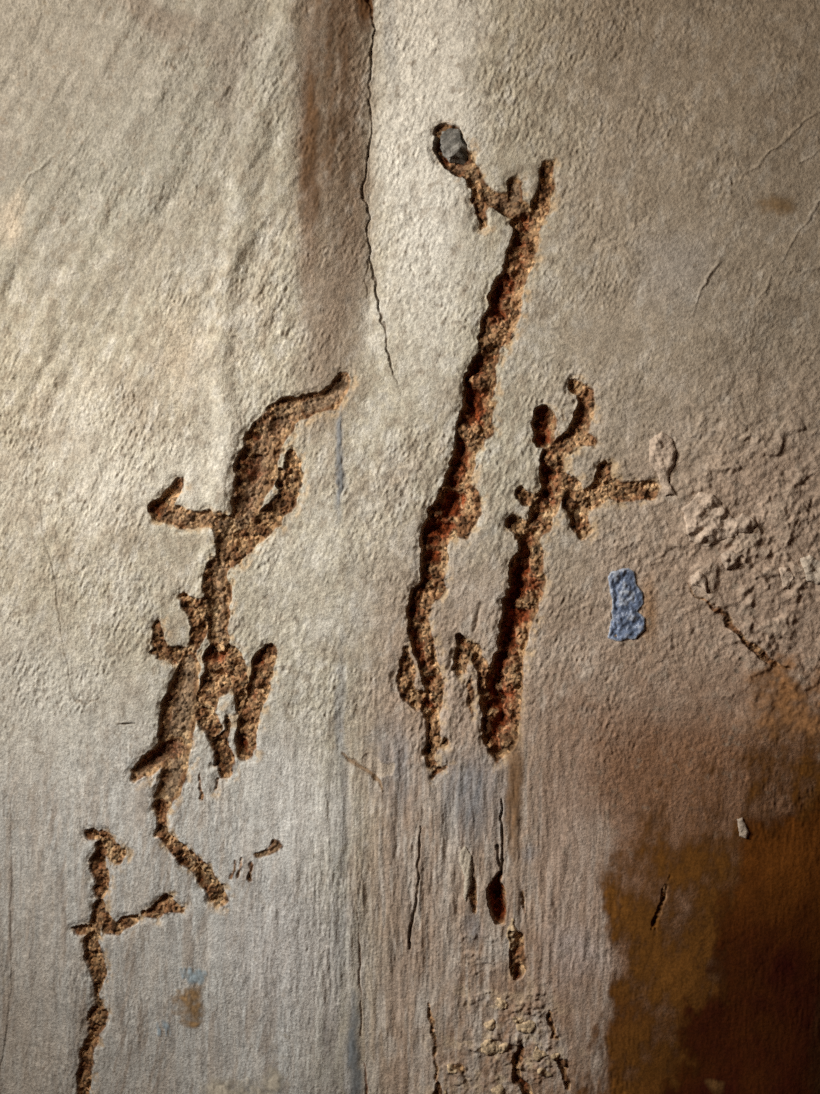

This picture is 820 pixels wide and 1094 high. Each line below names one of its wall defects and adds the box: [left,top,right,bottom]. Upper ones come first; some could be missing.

crack [359,0,401,395]
spalling [196,772,206,805]
spalling [460,846,528,927]
water stain [575,730,820,1094]
spalling [545,1009,562,1043]
hole [431,1081,444,1094]
hole [510,1043,535,1094]
spalling [555,1057,573,1093]